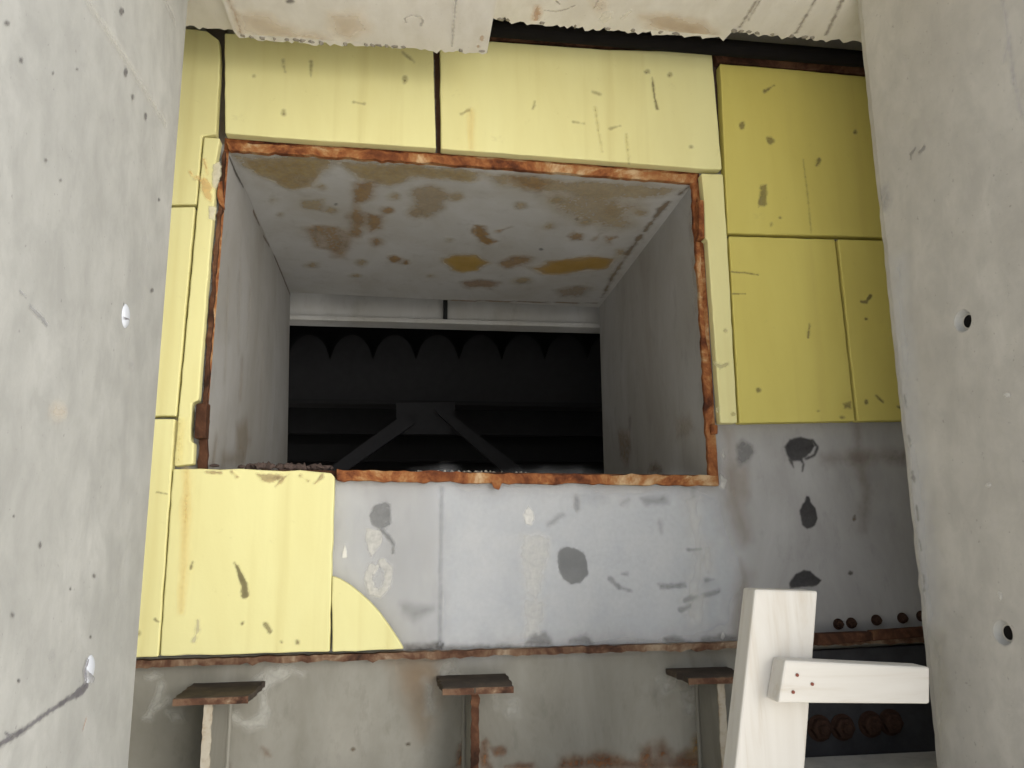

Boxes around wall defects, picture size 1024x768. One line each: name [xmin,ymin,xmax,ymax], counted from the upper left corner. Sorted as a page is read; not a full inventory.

rust [190,8,720,487]
rust [560,739,698,768]